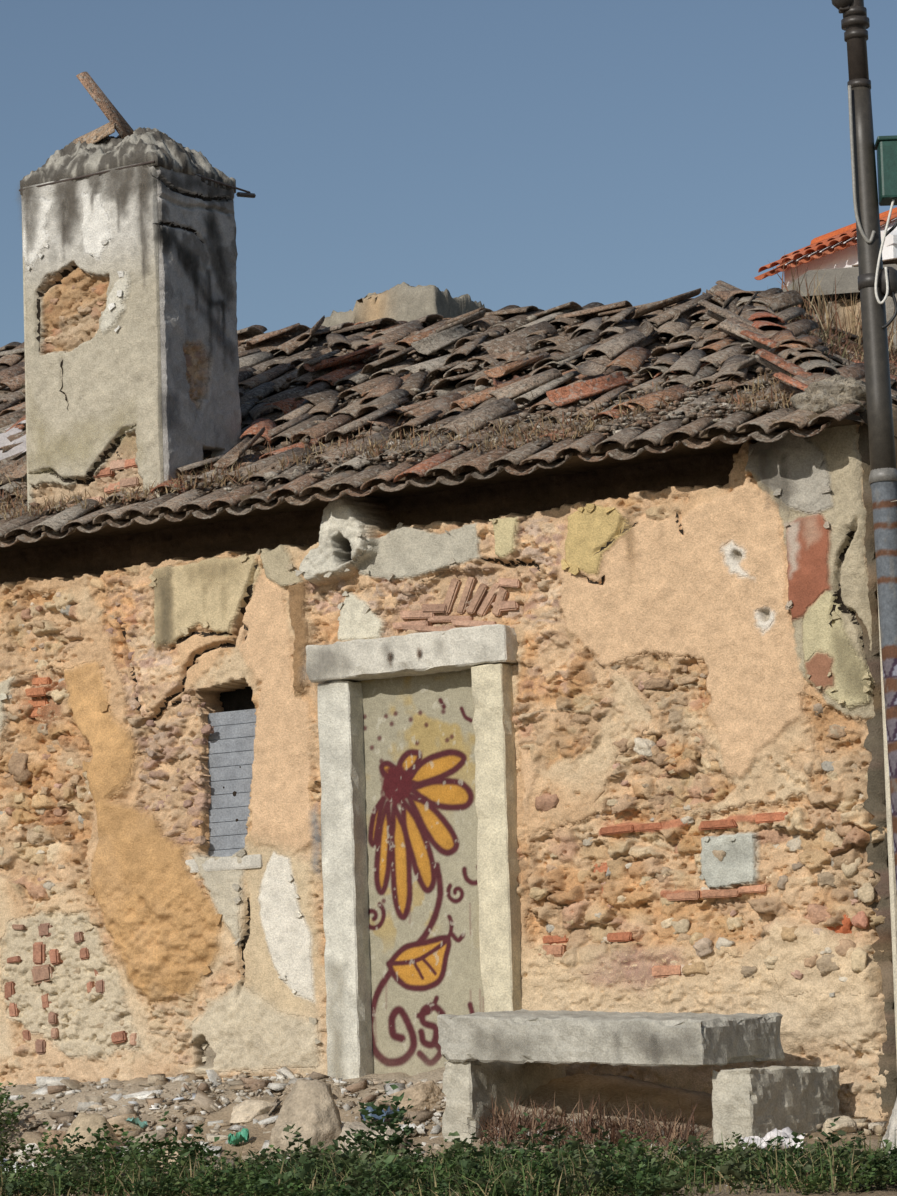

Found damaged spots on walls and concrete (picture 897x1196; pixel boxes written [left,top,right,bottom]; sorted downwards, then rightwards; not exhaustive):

water stain [21,185,36,231]
flaking render [22,196,53,271]
water stain [56,176,77,241]
spalling [38,192,129,355]
water stain [94,164,232,210]
water stain [144,220,231,338]
spalling [29,429,145,512]
spalling [337,516,526,641]
spalling [98,494,380,846]
spalling [524,504,887,998]
spalling [0,588,141,1060]
flaking render [257,851,314,1002]